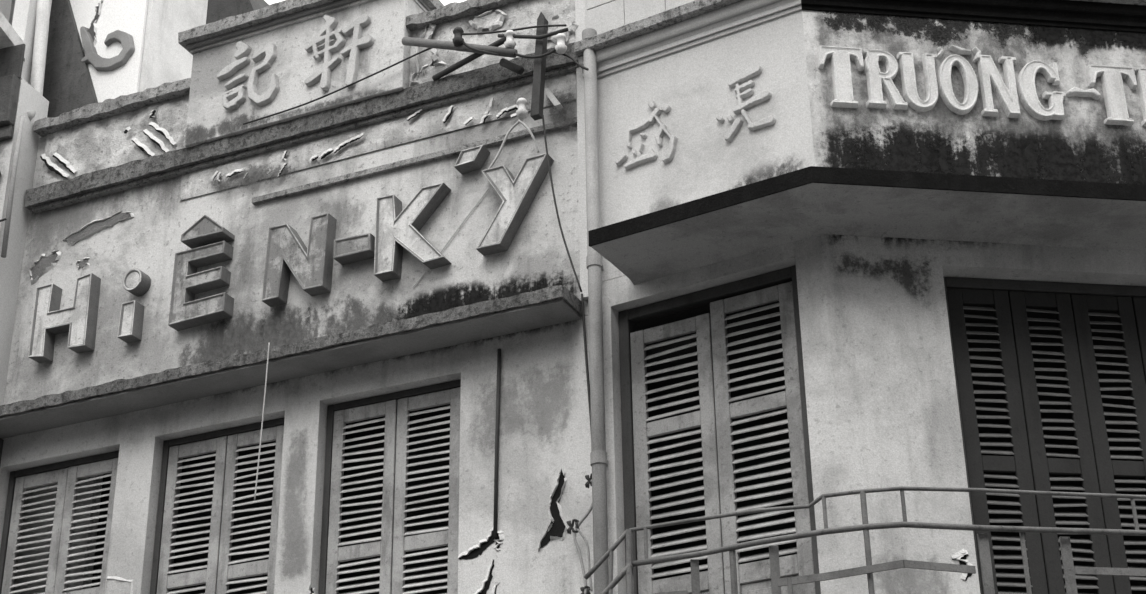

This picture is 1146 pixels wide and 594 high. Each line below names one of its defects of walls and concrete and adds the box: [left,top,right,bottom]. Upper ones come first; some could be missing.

damp [825,123,1146,185]
spalling [27,211,135,285]
damp [181,273,576,367]
flaking render [538,467,568,552]